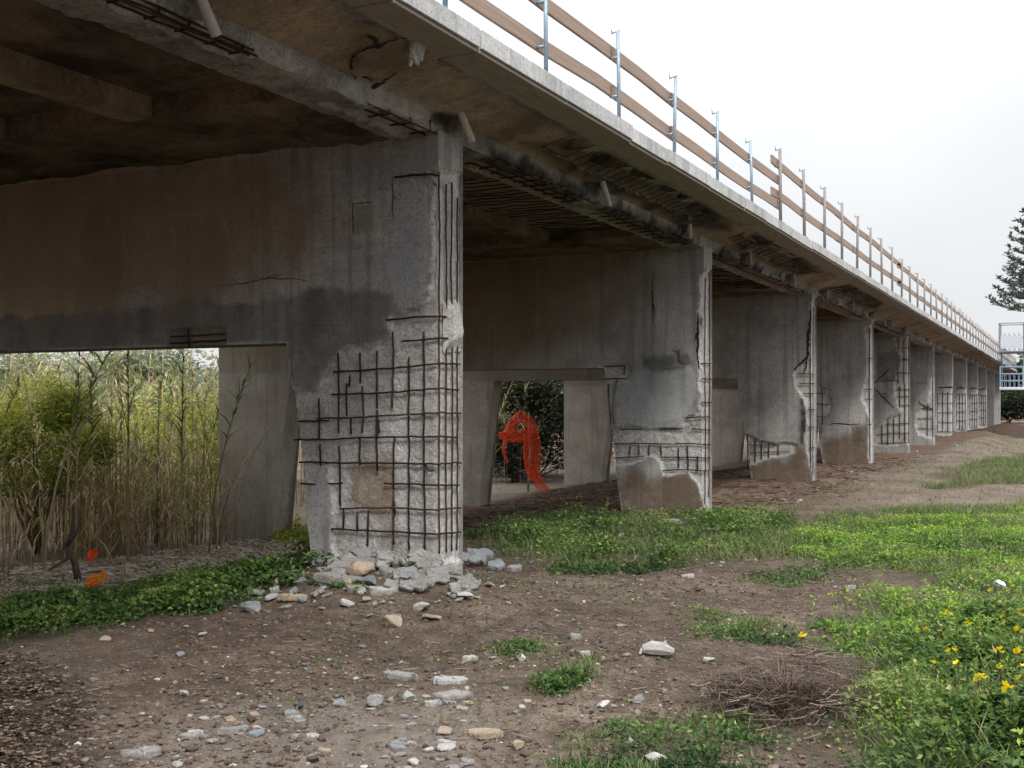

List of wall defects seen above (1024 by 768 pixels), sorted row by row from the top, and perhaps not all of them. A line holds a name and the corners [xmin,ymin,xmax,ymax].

spalling [96,0,260,63]
crack [349,36,441,90]
crack [218,274,306,287]
crack [649,276,657,325]
spalling [293,159,688,565]
spalling [598,255,800,510]
crack [794,311,812,372]
spalling [746,298,987,481]
crack [874,367,897,408]